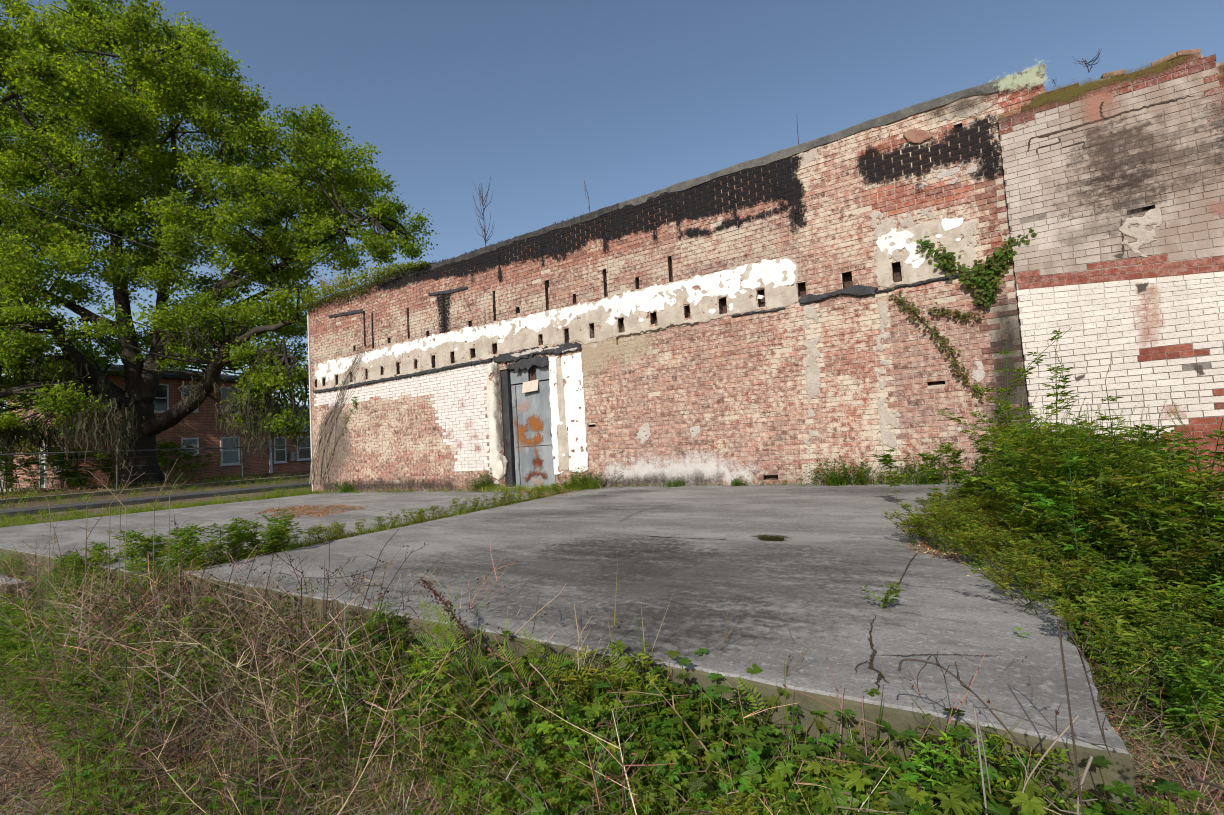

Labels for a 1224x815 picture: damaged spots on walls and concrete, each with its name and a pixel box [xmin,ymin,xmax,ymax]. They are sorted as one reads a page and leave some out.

leakage [787,186,807,232]
peeling [947,165,983,184]
leakage [1078,105,1224,208]
flaking render [865,207,977,389]
flaking render [314,256,823,484]
peeling [1129,342,1209,375]
corrosion [513,416,547,482]
peeling [1148,389,1224,498]
crack [855,614,997,689]